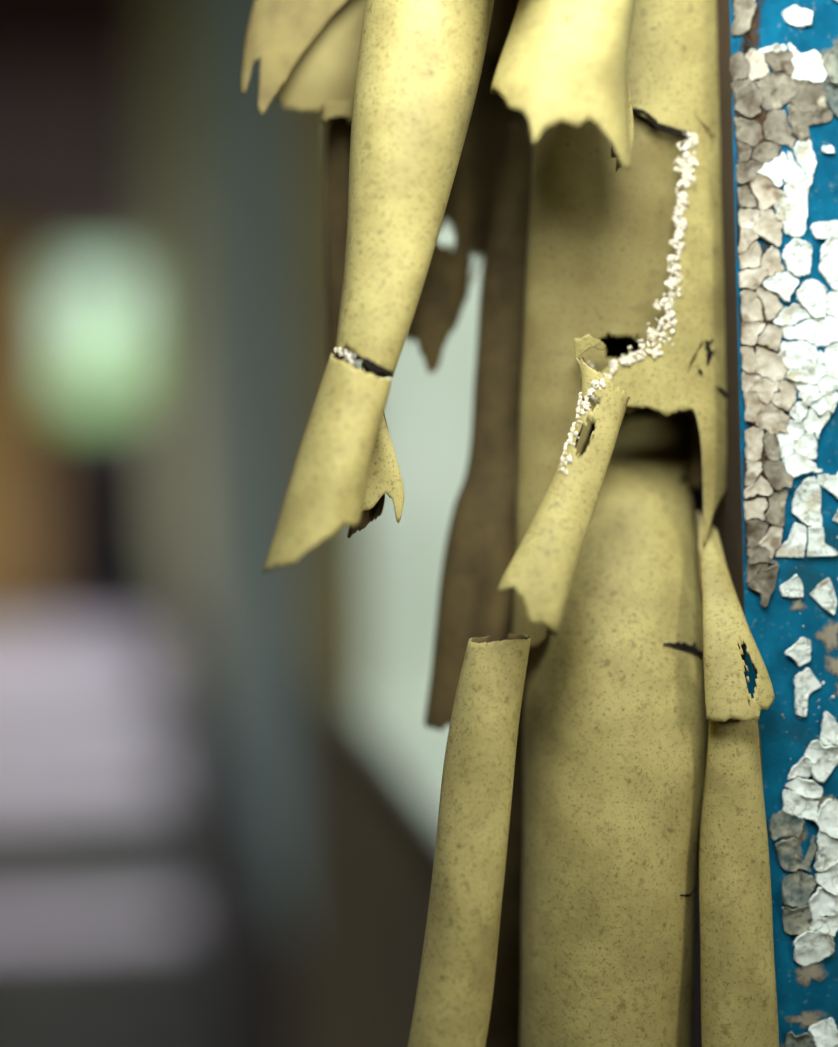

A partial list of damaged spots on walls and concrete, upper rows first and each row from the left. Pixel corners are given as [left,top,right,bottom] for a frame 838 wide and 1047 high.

peeling [731,0,757,36]
peeling [782,5,813,27]
peeling [729,42,838,621]
crack [344,352,394,377]
peeling [769,613,838,966]
peeling [785,1017,838,1047]